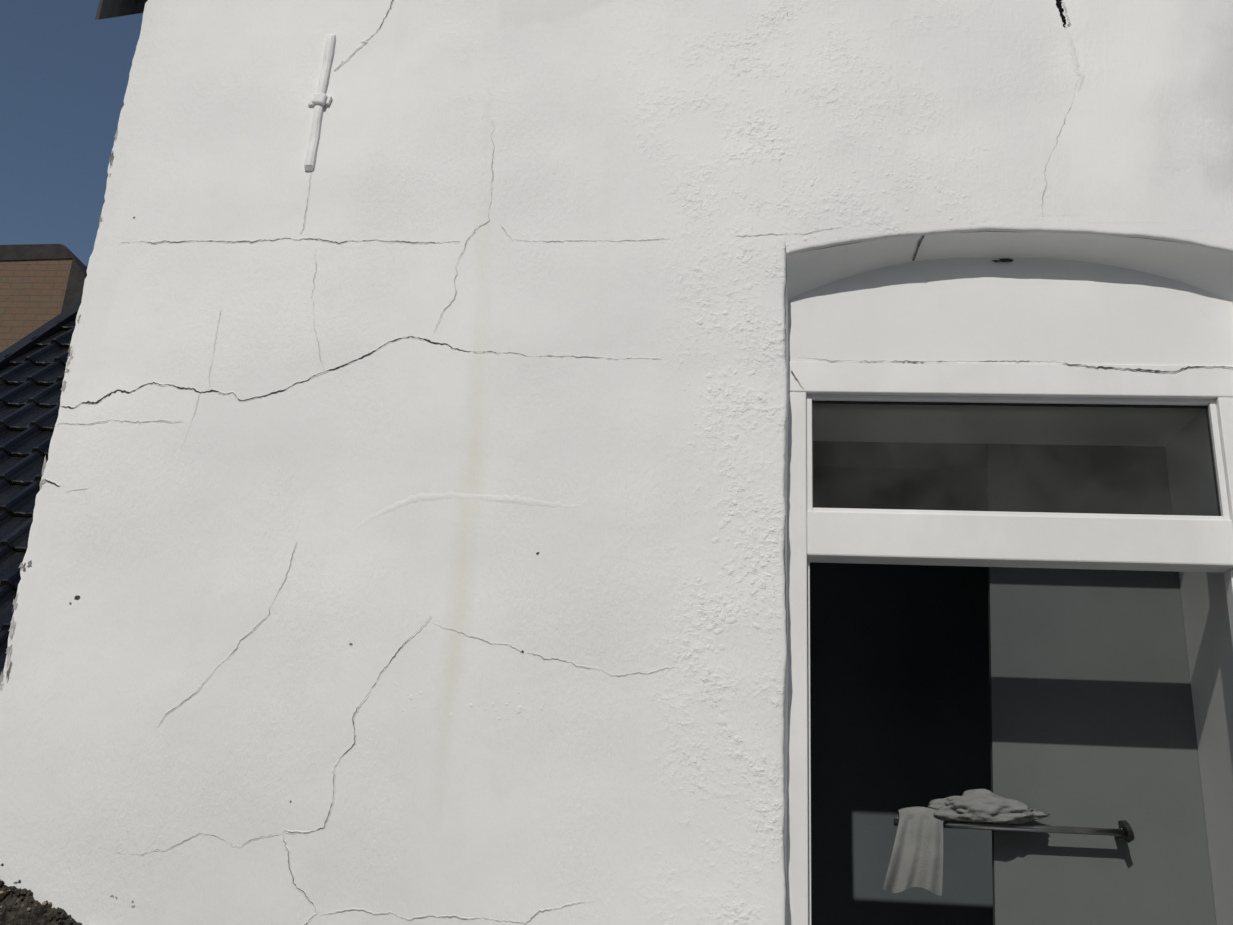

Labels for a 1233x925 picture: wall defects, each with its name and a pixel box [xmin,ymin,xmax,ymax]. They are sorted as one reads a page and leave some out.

crack [334,0,395,71]
crack [1056,0,1071,28]
crack [1042,80,1078,216]
crack [736,226,841,237]
crack [912,236,924,261]
crack [57,120,670,449]
crack [791,357,1233,389]
crack [156,542,298,728]
crack [115,616,676,925]
spalling [0,863,82,925]